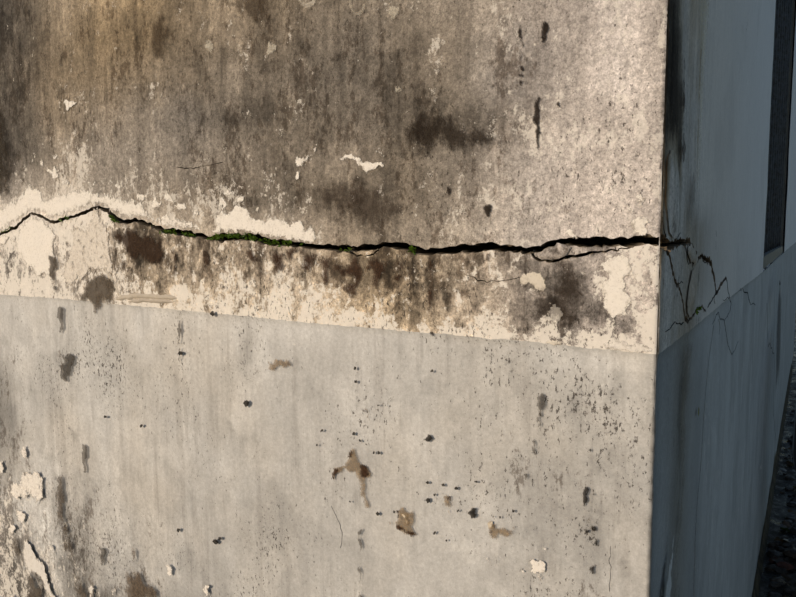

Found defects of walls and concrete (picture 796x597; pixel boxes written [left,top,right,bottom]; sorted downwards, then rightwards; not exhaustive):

peeling [340,144,384,174]
water stain [48,256,58,290]
peeling [0,154,200,313]
water stain [114,228,177,274]
peeling [212,190,316,243]
water stain [272,247,297,272]
water stain [302,253,384,297]
peeling [537,229,577,260]
peeling [600,254,634,319]
water stain [59,354,75,381]
crack [0,205,751,537]
peeling [8,470,55,597]